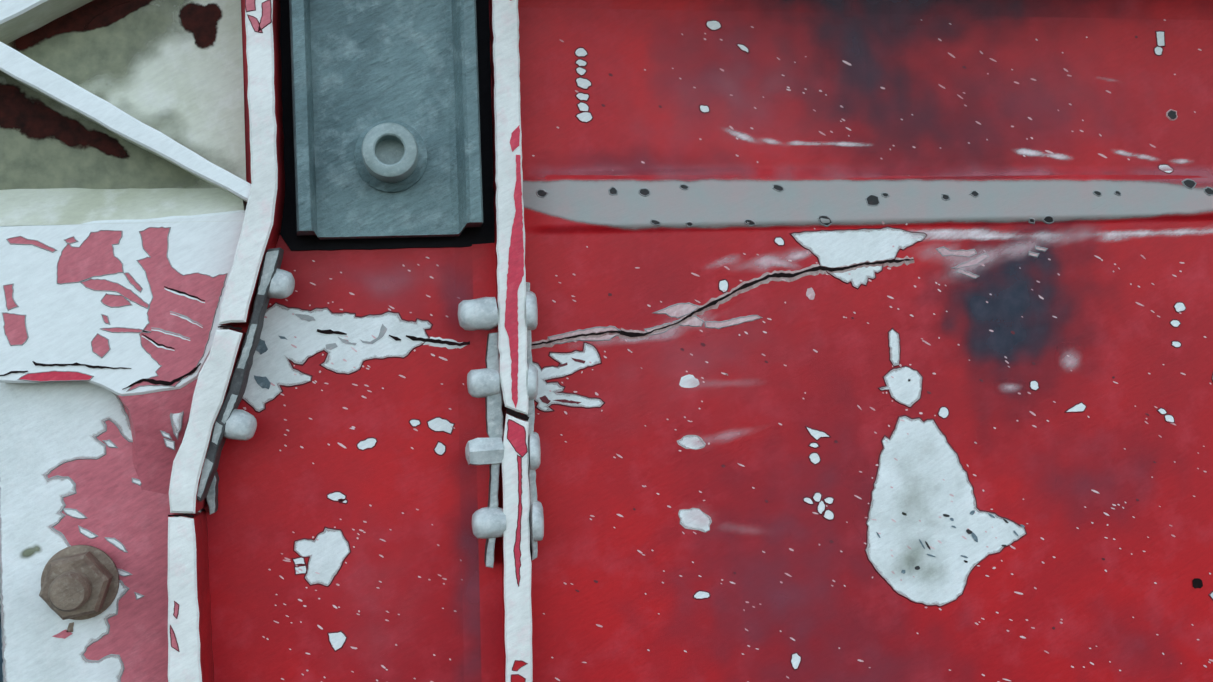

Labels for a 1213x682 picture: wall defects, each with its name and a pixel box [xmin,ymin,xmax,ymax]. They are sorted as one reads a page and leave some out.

peeling [3,283,19,311]
peeling [57,230,149,309]
peeling [99,314,151,333]
crack [316,328,347,337]
peeling [242,302,433,413]
crack [388,334,470,349]
crack [531,256,914,349]
peeling [774,215,990,290]
peeling [160,411,184,450]
peeling [864,327,1028,610]
peeling [0,381,144,682]
peeling [292,527,351,591]